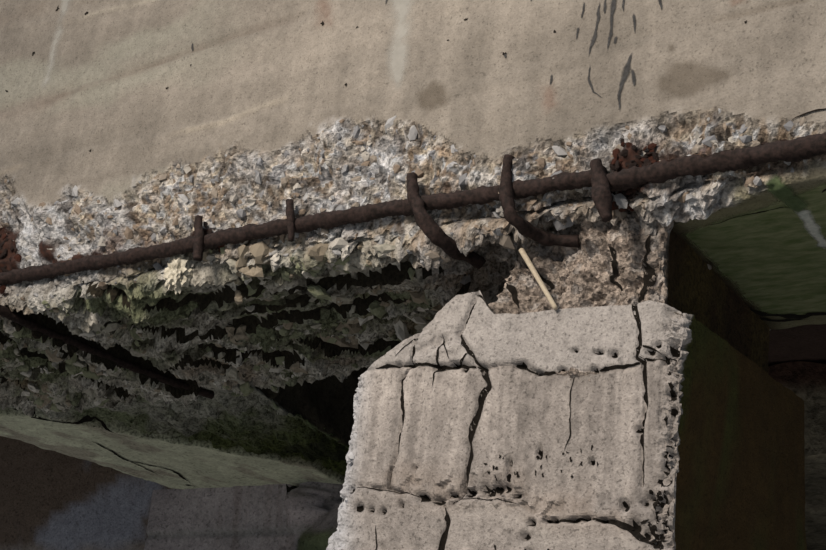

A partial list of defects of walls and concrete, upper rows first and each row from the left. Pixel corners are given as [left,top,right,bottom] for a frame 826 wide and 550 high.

damp [385,0,409,81]
spalling [0,106,826,269]
corrosion [611,182,651,213]
corrosion [609,138,673,172]
corrosion [0,225,22,273]
corrosion [38,241,103,263]
crack [538,272,555,291]
spalling [0,154,826,550]
crack [600,235,677,487]
crack [0,261,517,550]
crack [524,367,575,452]
crack [542,518,660,548]